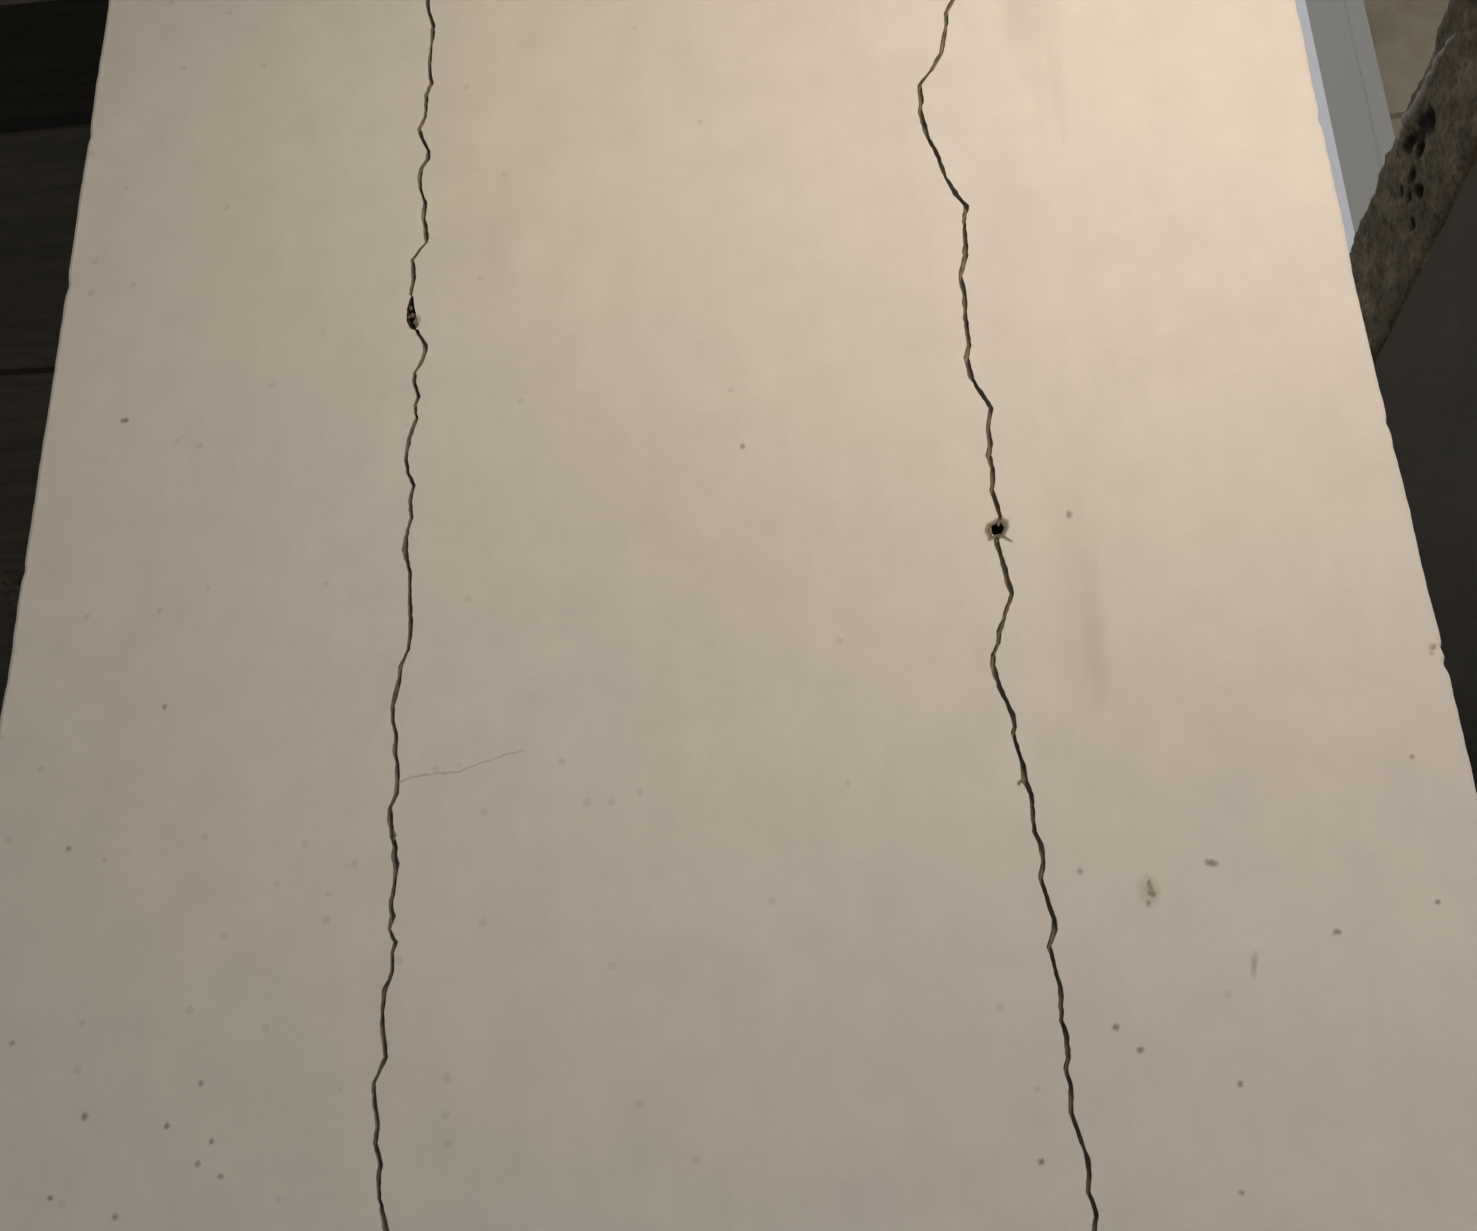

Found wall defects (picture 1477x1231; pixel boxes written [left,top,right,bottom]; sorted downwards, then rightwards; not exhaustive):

crack [409,0,436,296]
crack [371,331,428,1231]
crack [917,0,1099,1231]